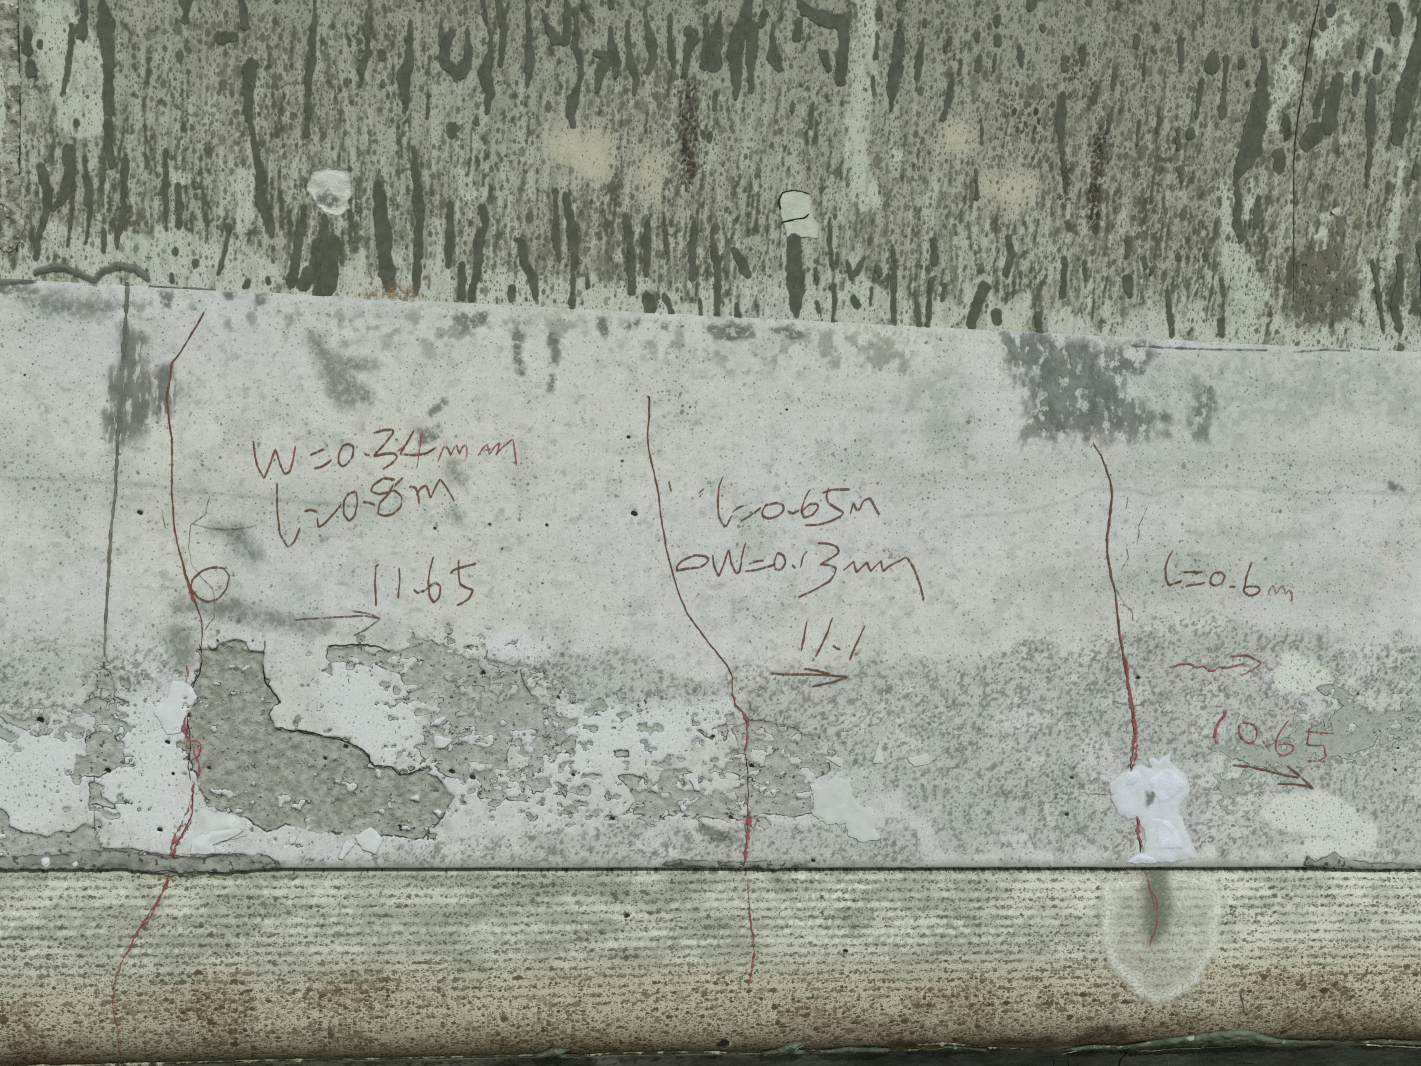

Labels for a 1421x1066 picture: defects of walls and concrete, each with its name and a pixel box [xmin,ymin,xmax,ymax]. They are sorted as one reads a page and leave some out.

leakage [33,0,129,261]
leakage [224,204,341,305]
leakage [373,145,425,296]
leakage [438,0,850,181]
leakage [772,216,898,339]
leakage [966,234,1168,442]
leakage [1136,26,1384,244]
crack [1109,496,1148,619]
peeling [0,649,247,868]
crack [162,491,414,851]
spalling [153,619,880,866]
leakage [1090,753,1223,1003]